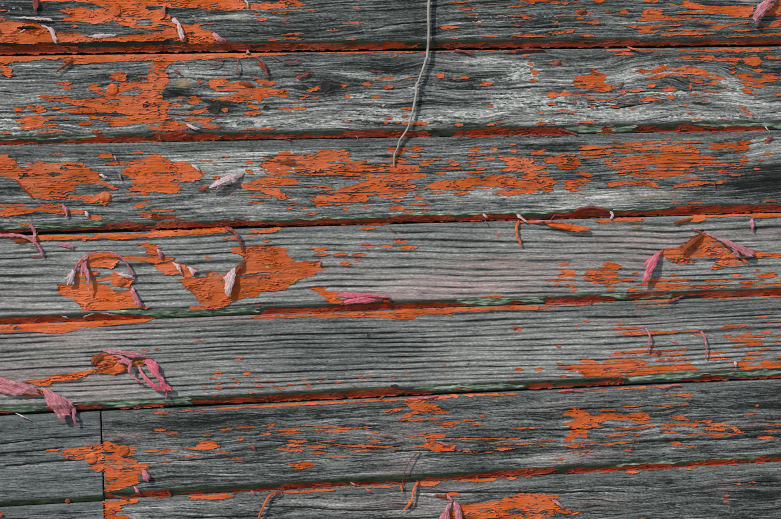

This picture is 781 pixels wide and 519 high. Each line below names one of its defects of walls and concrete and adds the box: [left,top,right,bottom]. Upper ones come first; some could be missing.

peeling [0,0,781,333]
peeling [0,311,781,519]